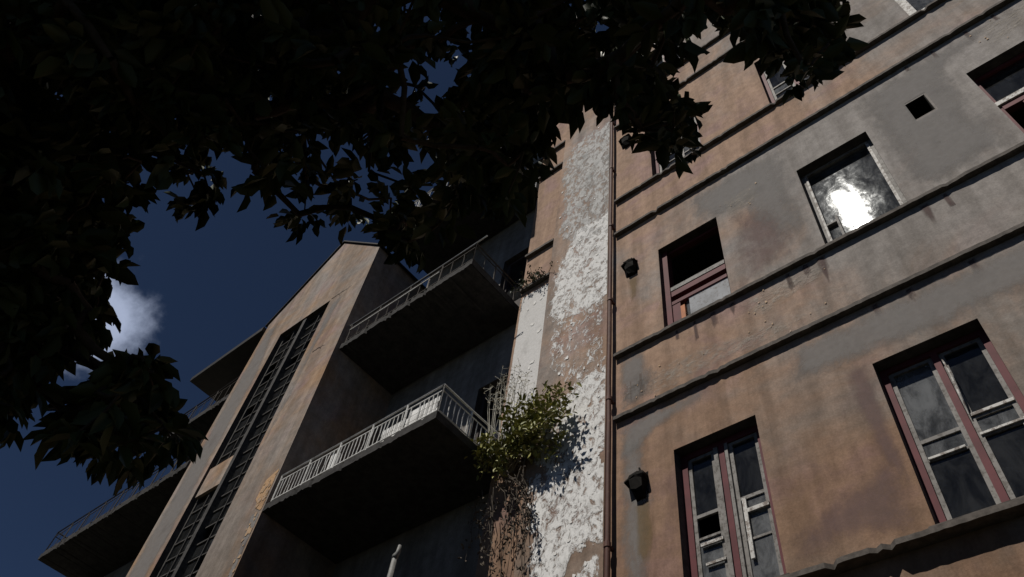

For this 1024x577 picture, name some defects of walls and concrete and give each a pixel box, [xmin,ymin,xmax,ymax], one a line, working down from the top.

flaking render [227,468,280,577]
peeling [501,122,610,577]